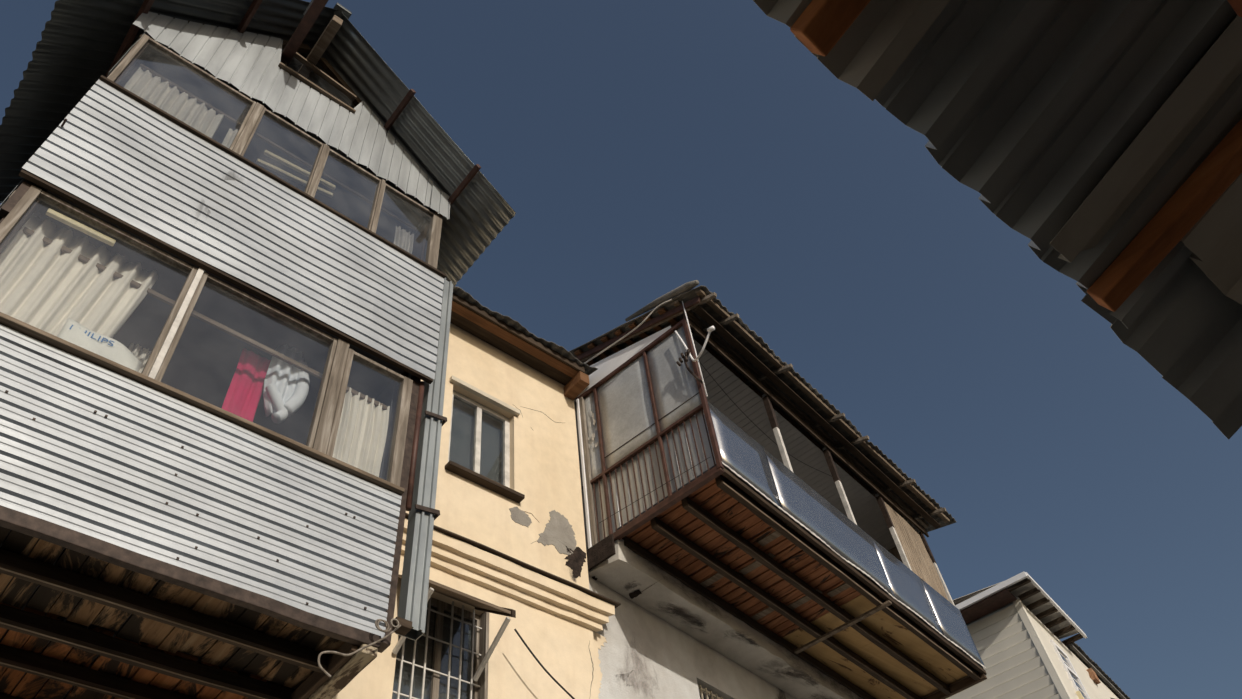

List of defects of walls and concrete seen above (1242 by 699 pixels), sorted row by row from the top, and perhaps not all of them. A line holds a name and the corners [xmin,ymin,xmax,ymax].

peeling [509,507,598,580]